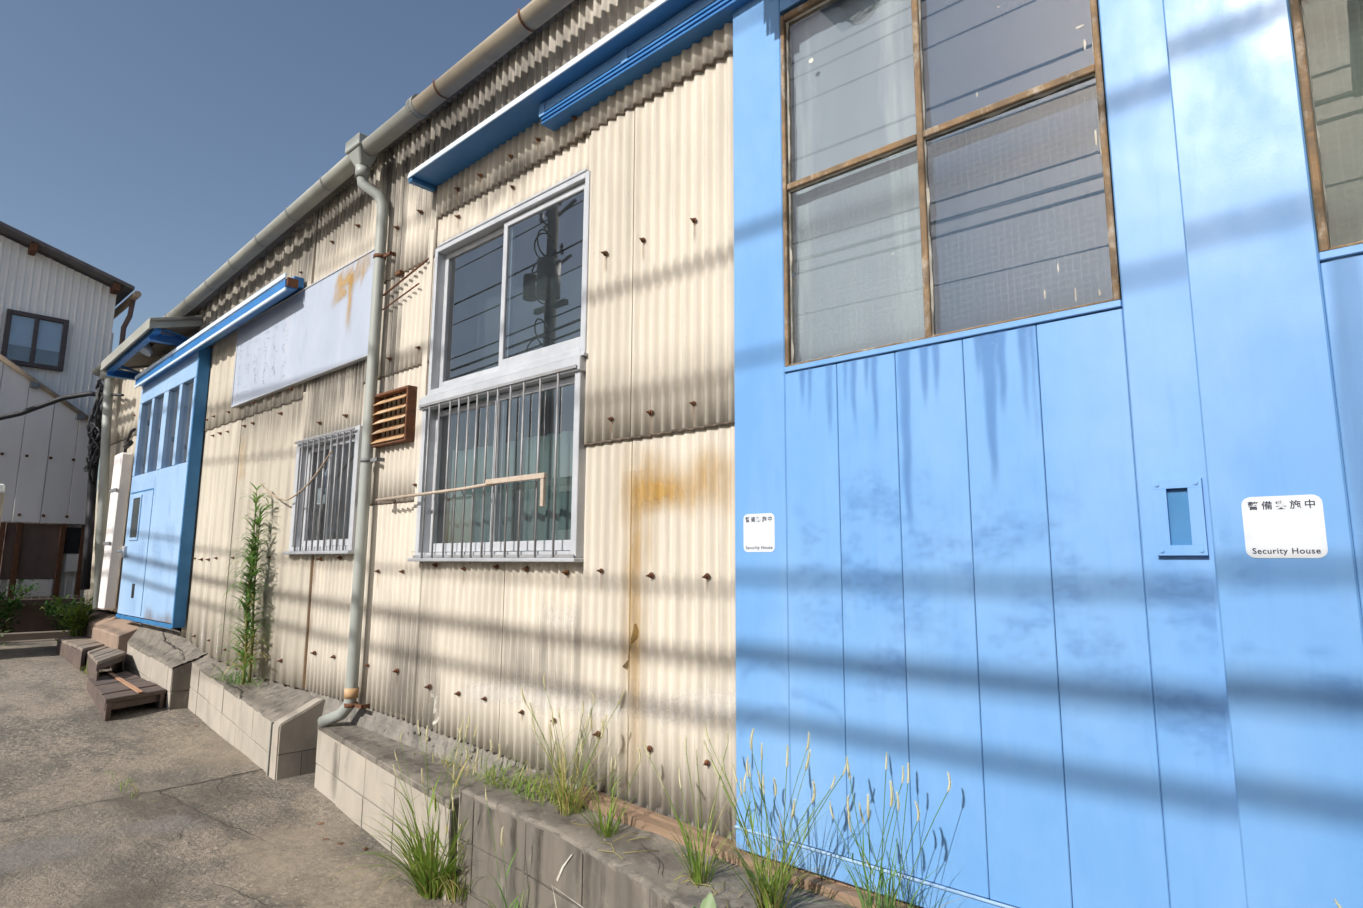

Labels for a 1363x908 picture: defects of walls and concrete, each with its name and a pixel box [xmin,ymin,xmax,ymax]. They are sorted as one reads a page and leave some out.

corrosion [633,478,684,505]
crack [0,769,287,852]